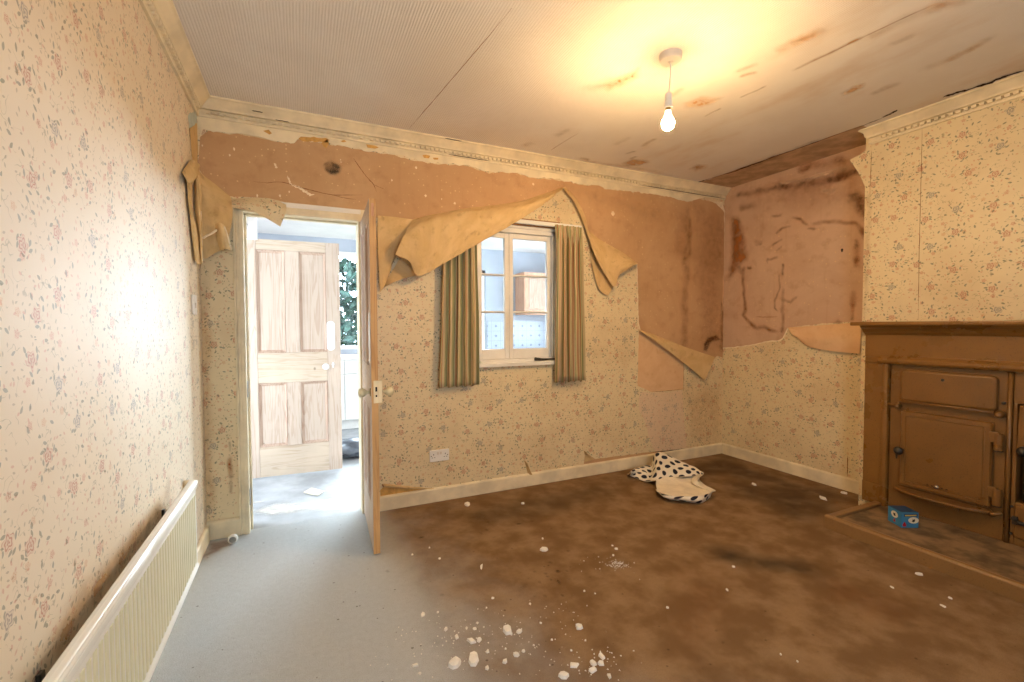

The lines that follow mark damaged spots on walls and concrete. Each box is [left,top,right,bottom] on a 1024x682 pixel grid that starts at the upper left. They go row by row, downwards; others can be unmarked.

flaking render [182,112,871,392]
damp [732,219,754,327]